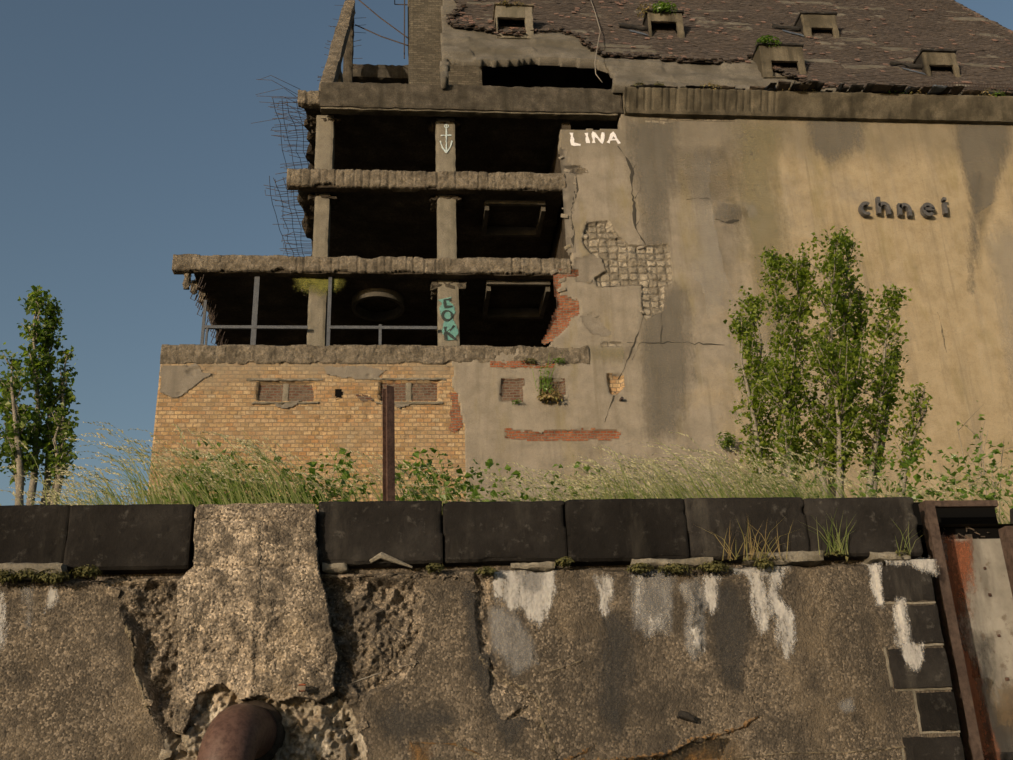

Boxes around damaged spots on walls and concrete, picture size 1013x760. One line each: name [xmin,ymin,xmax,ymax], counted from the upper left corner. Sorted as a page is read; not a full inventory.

spalling [542,147,673,347]
crack [618,146,645,244]
flaking render [324,366,385,400]
flaking render [448,393,463,433]
spalling [95,572,480,760]
damp [596,575,630,732]
crack [479,656,758,760]
damp [633,570,672,635]
damp [703,565,796,688]
corrosion [942,538,998,760]